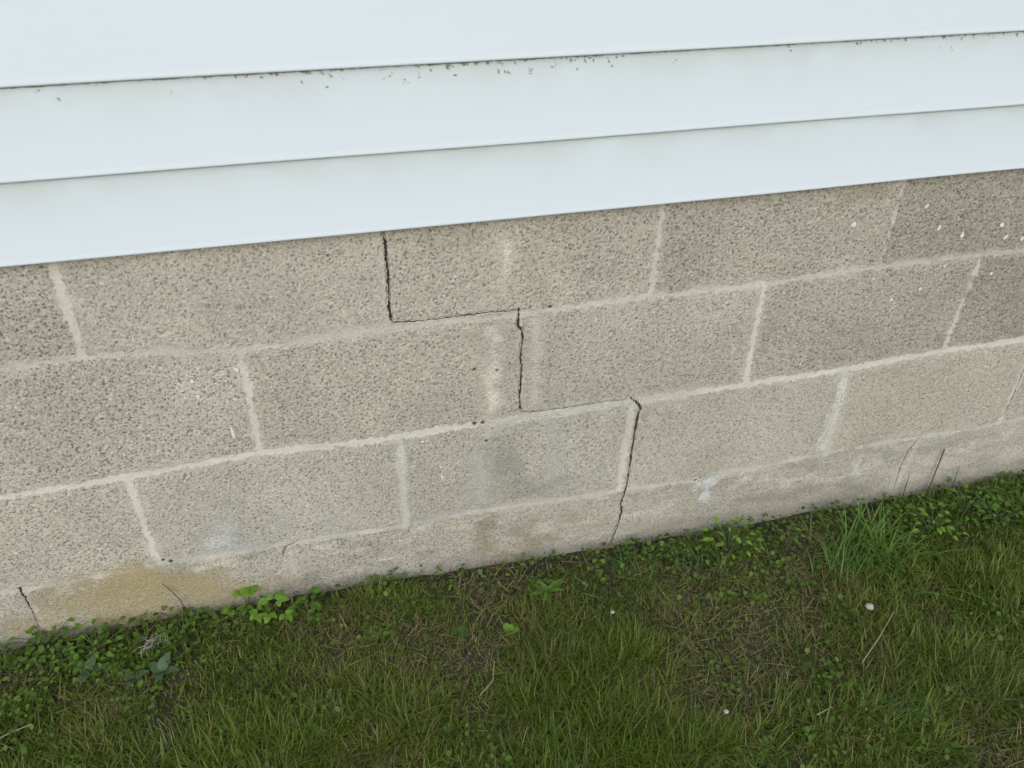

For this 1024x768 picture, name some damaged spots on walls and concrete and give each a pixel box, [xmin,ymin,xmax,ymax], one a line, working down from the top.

crack [381,233,642,542]